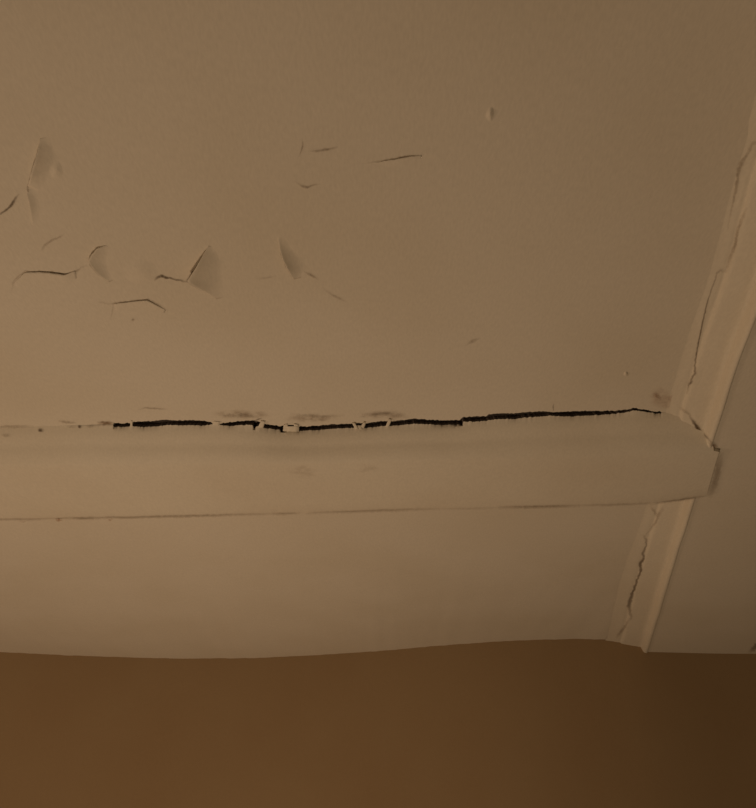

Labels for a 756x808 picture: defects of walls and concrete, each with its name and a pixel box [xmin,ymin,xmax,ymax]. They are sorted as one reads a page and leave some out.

crack [102,408,662,433]